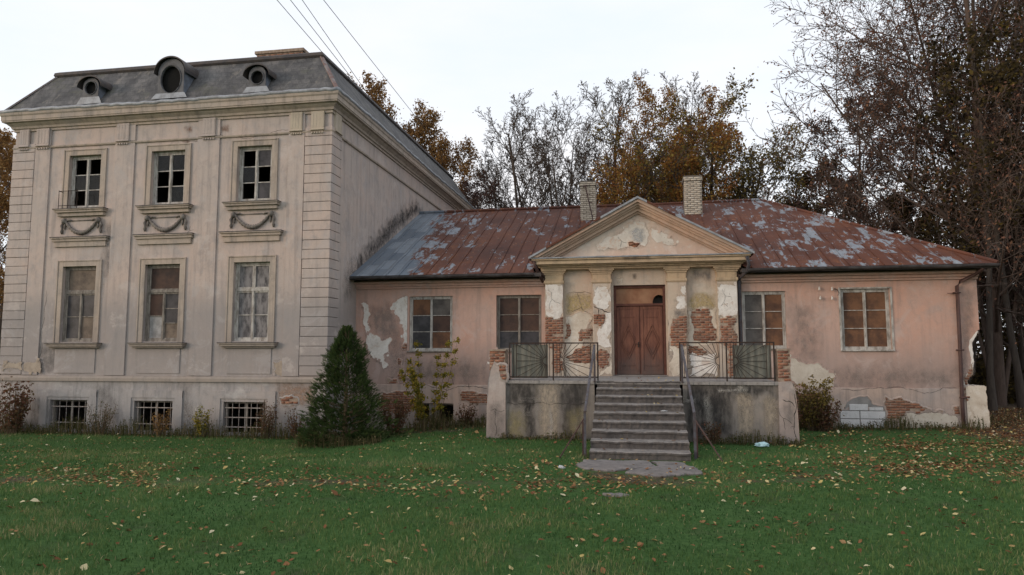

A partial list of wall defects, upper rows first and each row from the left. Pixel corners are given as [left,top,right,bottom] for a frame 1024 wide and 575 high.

peeling [596,220,679,251]
peeling [360,295,416,415]
flaking render [458,389,487,406]
flaking render [487,347,510,383]
peeling [545,284,612,376]
flaking render [669,282,738,377]
peeling [790,355,836,428]
flaking render [882,331,978,428]